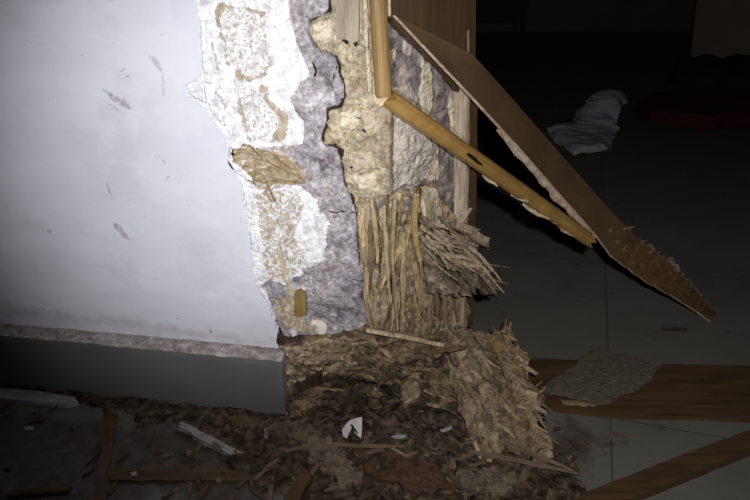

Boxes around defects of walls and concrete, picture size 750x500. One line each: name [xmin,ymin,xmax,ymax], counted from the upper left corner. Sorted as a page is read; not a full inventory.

flaking render [186,0,472,337]